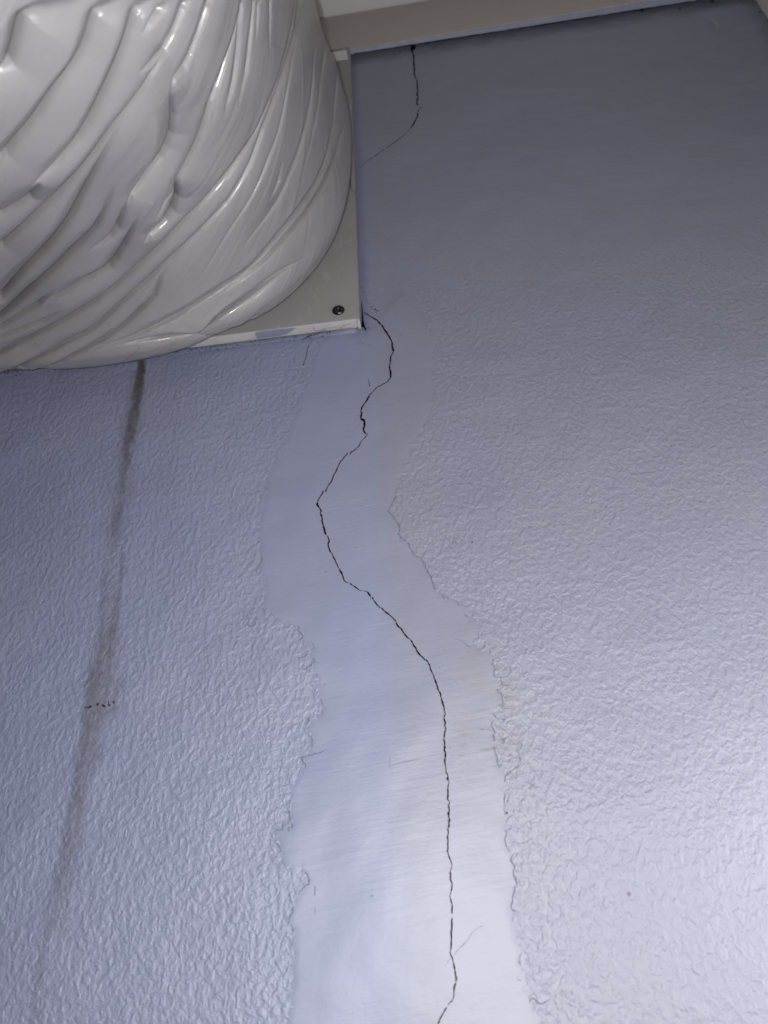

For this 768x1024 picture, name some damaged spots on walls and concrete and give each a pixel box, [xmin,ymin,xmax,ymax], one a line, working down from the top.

water stain [128,360,145,429]
crack [303,312,483,1024]
peeling [479,659,523,815]